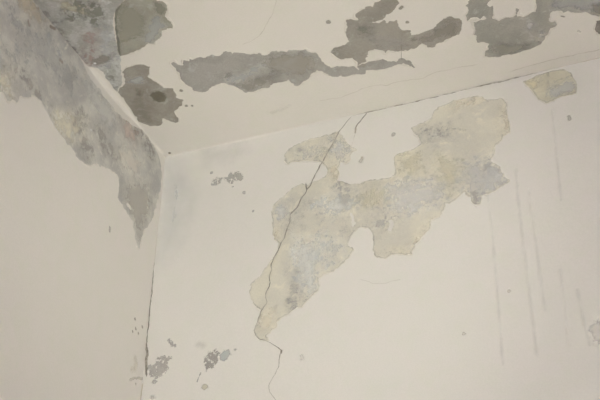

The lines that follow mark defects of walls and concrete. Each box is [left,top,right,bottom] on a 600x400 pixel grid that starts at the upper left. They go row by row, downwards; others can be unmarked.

peeling [0,0,600,250]
peeling [249,95,512,342]
crack [254,49,600,400]